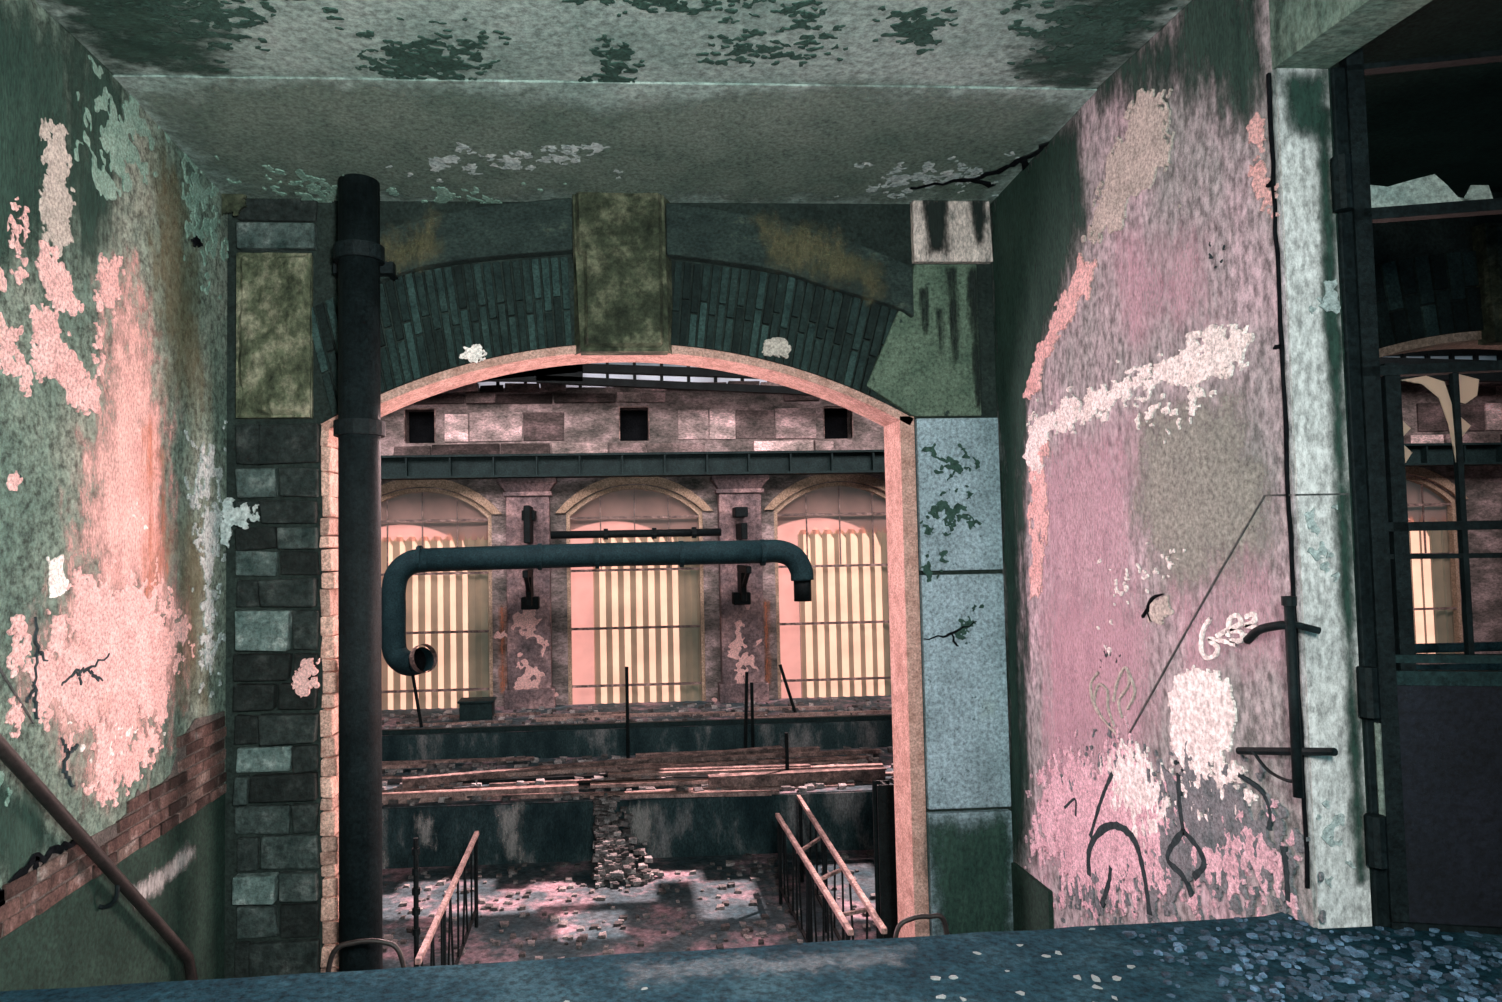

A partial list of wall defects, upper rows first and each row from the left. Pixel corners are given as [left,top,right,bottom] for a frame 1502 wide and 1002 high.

peeling [181,153,344,299]
crack [909,141,1049,189]
peeling [1246,112,1280,219]
peeling [1022,88,1255,600]
peeling [0,55,260,939]
water stain [0,0,1279,934]
peeling [1304,505,1340,582]
water stain [1284,68,1366,884]
crack [25,617,110,788]
spalling [494,609,558,697]
spalling [727,604,762,684]
peeling [1023,665,1356,1002]